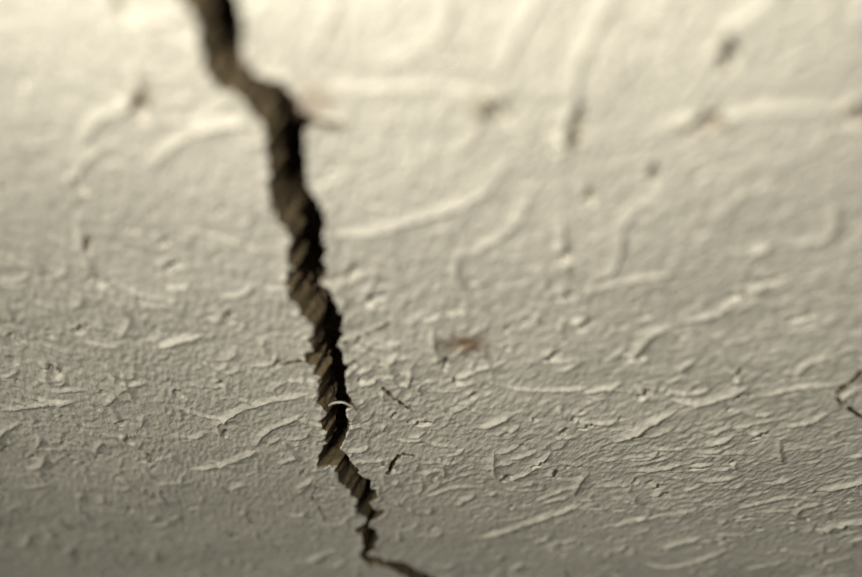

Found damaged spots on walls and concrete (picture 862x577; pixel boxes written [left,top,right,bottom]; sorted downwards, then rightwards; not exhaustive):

crack [181,0,431,577]
crack [834,371,862,419]